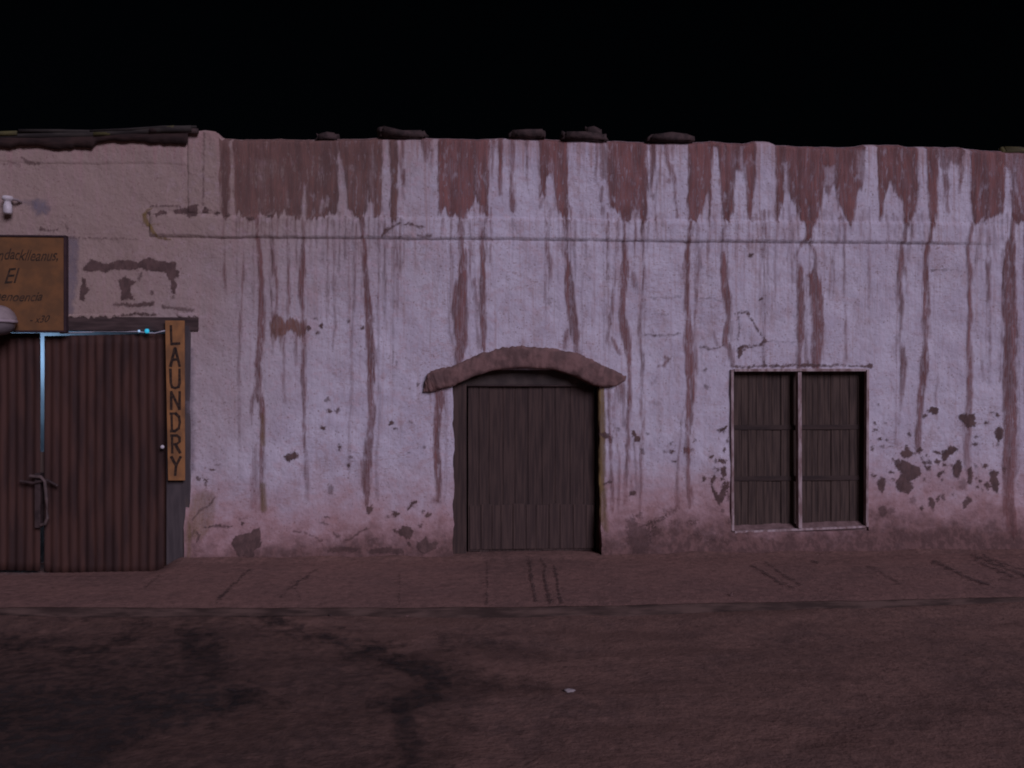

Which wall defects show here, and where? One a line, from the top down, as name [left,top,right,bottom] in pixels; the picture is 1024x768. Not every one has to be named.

peeling [80,257,180,316]
rust [271,315,307,338]
spalling [959,412,1004,445]
spalling [703,425,730,505]
spalling [872,432,1005,508]
spalling [232,522,262,558]
spalling [330,500,438,554]